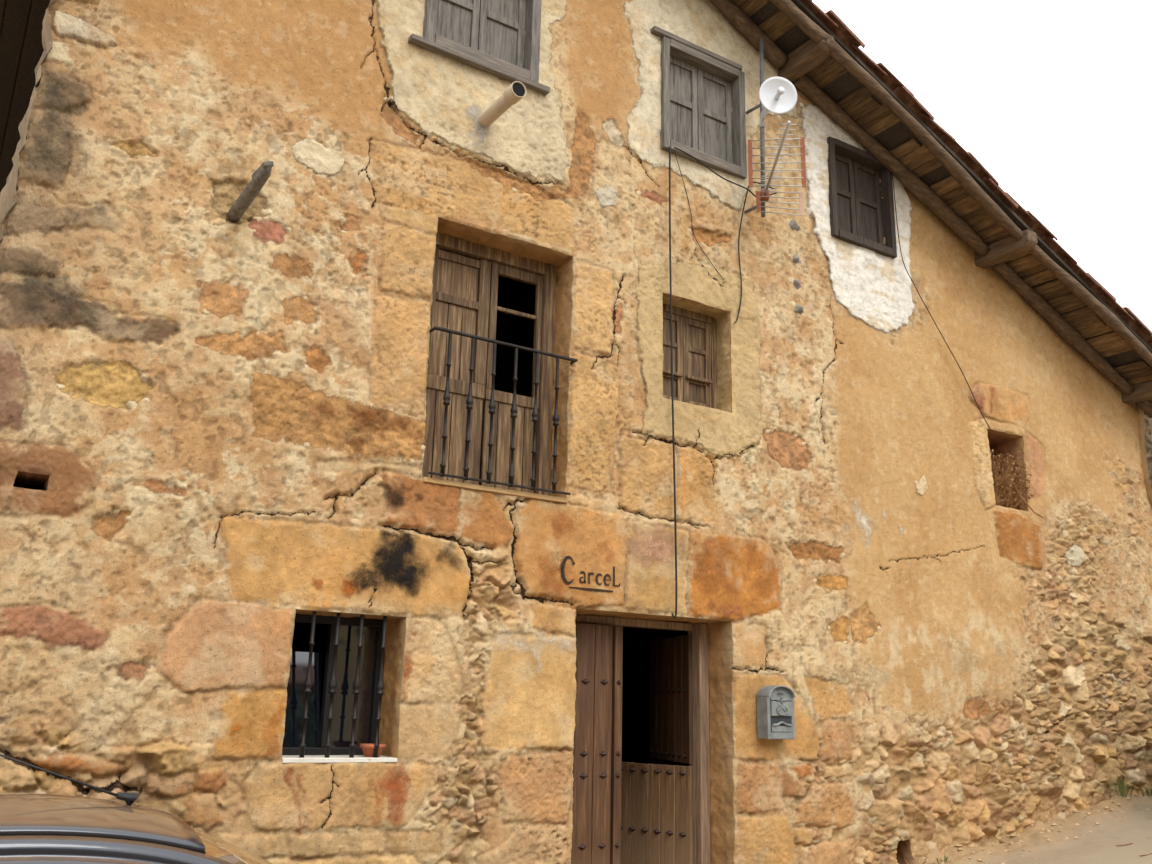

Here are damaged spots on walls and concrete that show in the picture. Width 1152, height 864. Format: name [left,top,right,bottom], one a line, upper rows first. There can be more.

crack [361,0,558,185]
crack [358,138,376,207]
water stain [343,532,458,596]
crack [879,546,985,570]